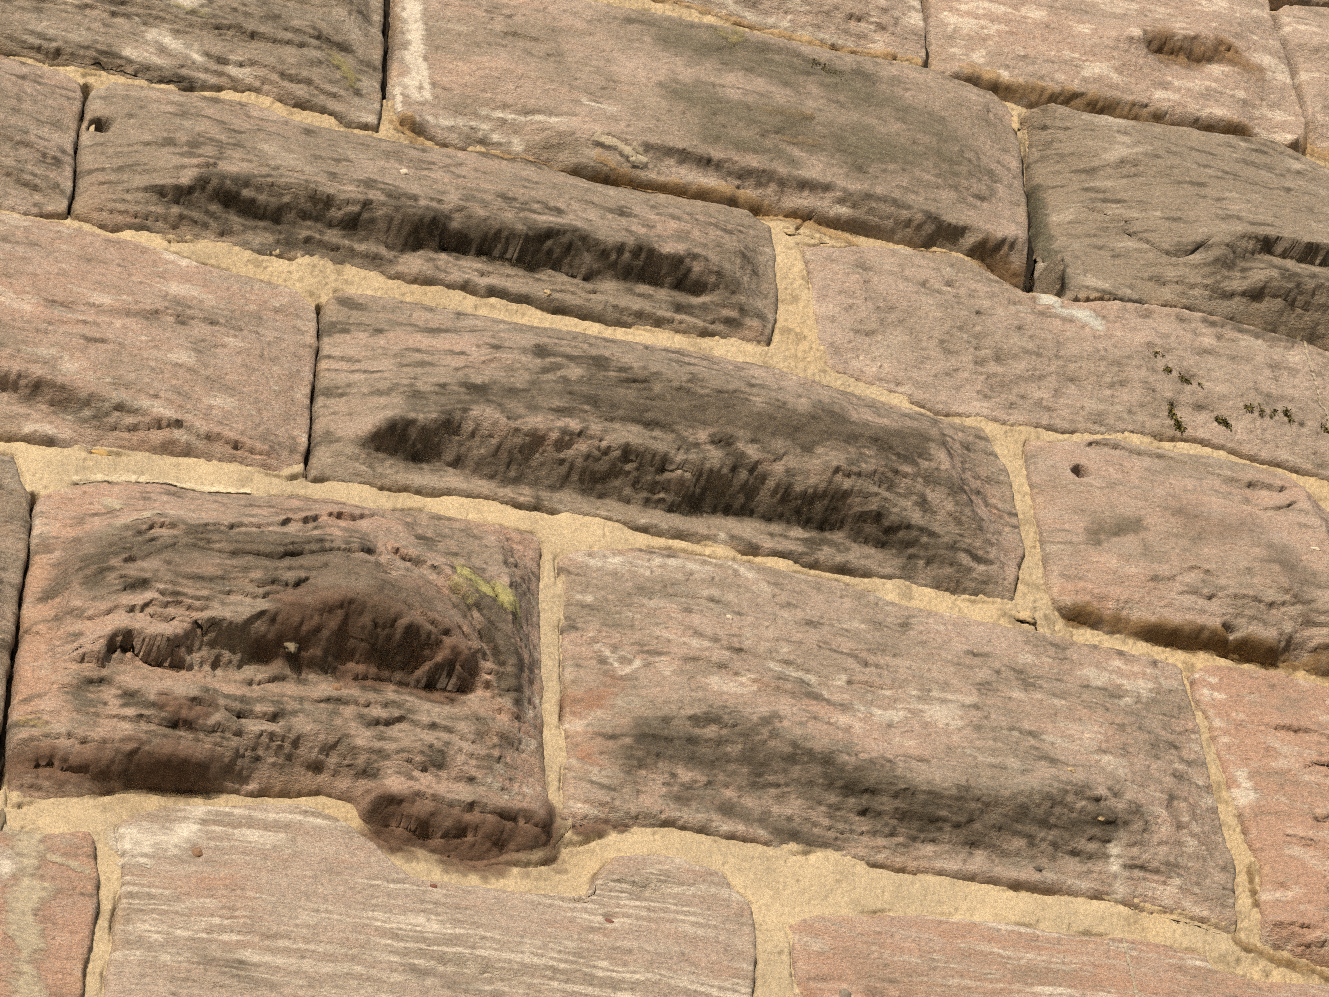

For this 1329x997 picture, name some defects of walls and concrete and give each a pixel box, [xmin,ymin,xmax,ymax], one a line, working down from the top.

crack [1089,210,1212,258]
leakage [0,825,22,878]